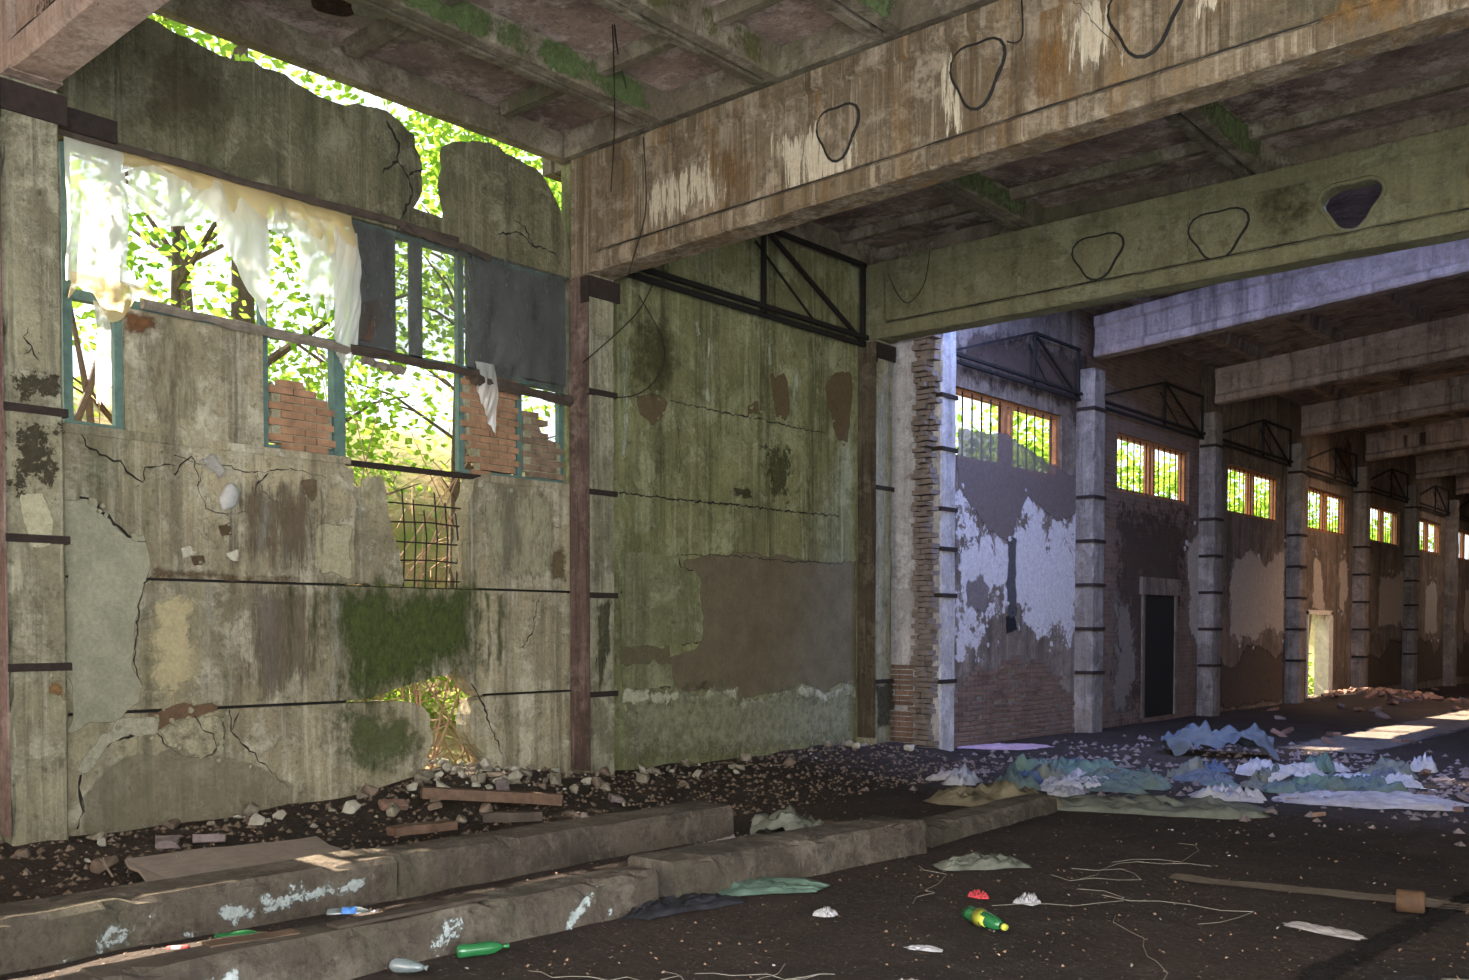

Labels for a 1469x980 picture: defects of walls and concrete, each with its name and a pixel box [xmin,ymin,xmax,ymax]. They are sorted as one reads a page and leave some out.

spalling [311,0,385,20]
mould [10,370,62,403]
mould [5,421,67,504]
crack [81,434,326,518]
mould [761,441,793,510]
spalling [891,330,1087,749]
damp [595,600,612,688]
crack [106,710,279,780]
crack [471,683,502,754]
damp [622,683,856,763]
damp [874,683,894,727]
crack [76,773,85,829]